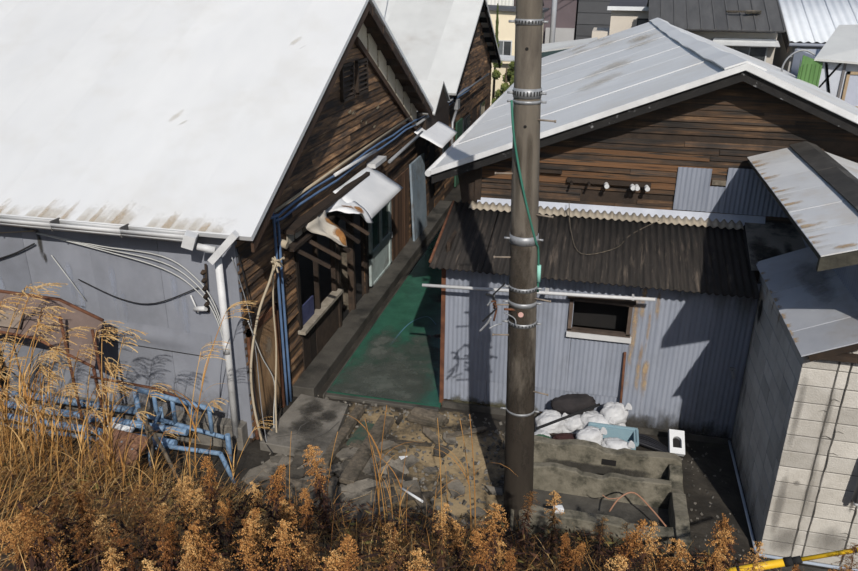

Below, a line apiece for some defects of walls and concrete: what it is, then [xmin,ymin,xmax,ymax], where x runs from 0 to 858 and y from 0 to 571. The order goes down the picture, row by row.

corrosion [326,218,347,246]